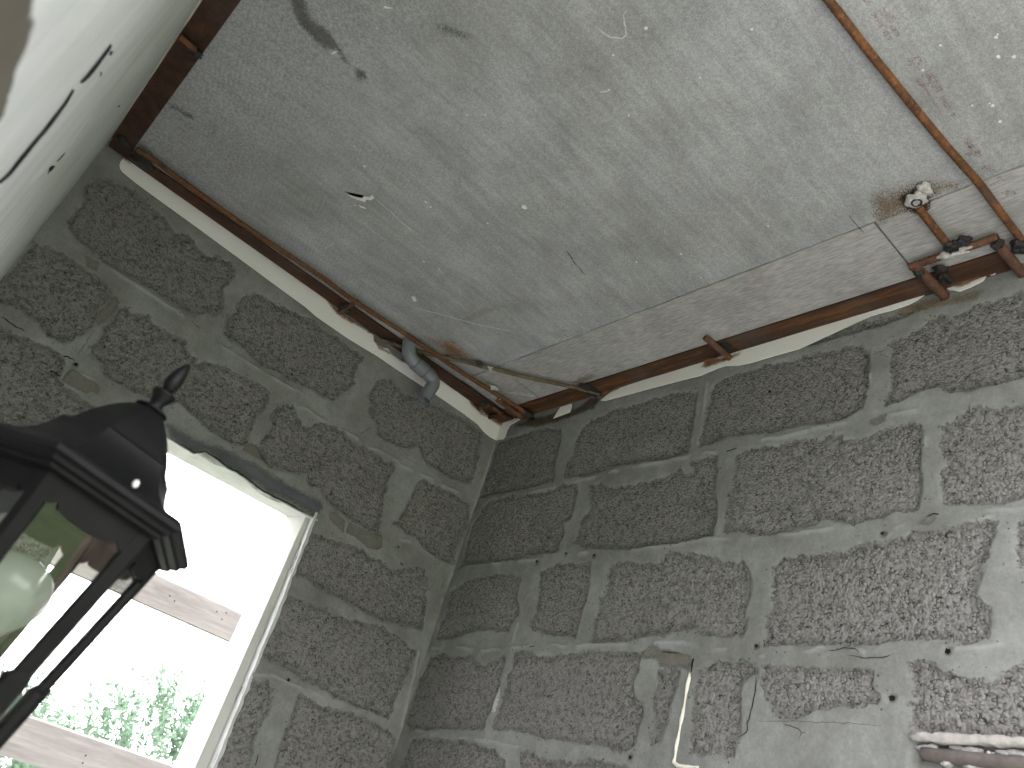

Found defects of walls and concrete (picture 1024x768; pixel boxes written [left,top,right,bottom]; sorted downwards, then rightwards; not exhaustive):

leakage [289,0,366,82]
crack [0,44,113,184]
rust [871,181,962,223]
crack [828,647,894,659]
crack [739,675,882,737]